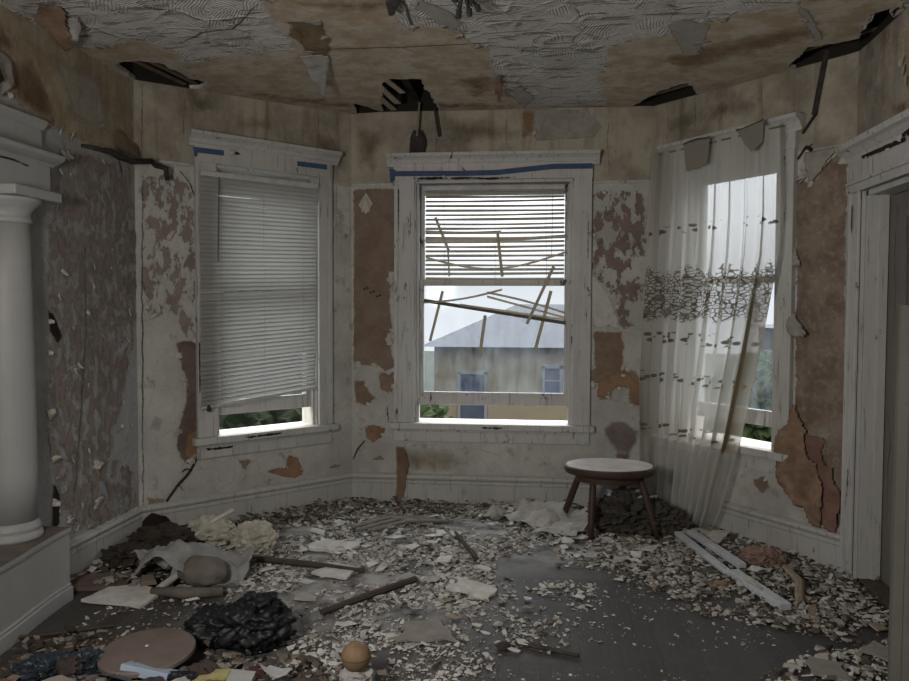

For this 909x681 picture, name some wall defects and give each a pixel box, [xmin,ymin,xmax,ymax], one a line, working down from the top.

water stain [288,20,332,59]
flaking render [0,0,524,532]
peeling [590,189,647,409]